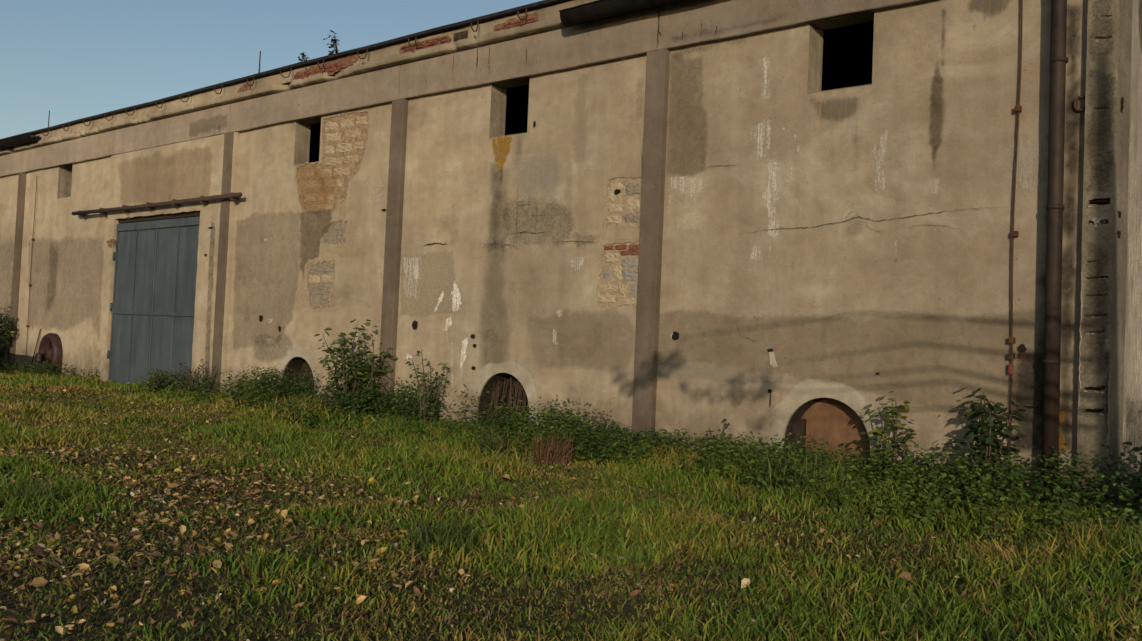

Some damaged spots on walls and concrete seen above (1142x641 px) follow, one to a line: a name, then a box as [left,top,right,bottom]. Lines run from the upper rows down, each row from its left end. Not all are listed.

spalling [399,30,468,54]
spalling [493,12,539,32]
spalling [293,54,358,80]
damp [930,72,942,154]
spalling [296,112,369,245]
rust [493,136,511,182]
spalling [604,177,642,229]
crack [771,206,1006,232]
spalling [307,261,335,309]
peeling [435,281,462,328]
spalling [596,241,639,310]
peeling [460,334,476,370]